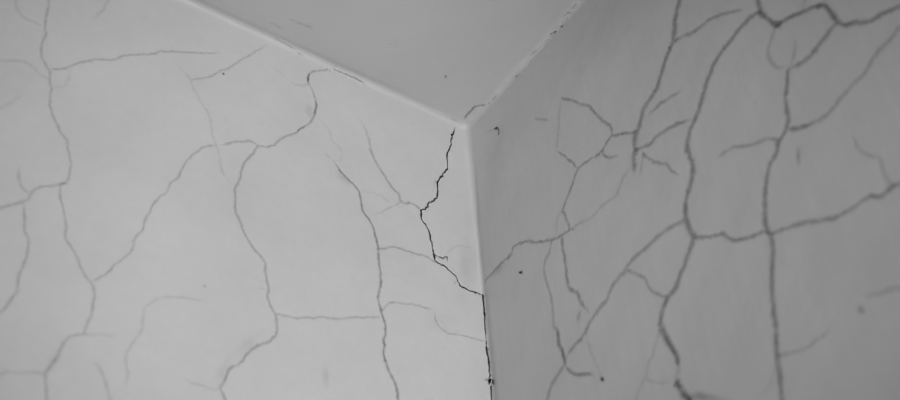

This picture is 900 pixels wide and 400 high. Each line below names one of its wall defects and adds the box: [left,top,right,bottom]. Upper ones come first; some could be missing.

crack [420,128,492,400]